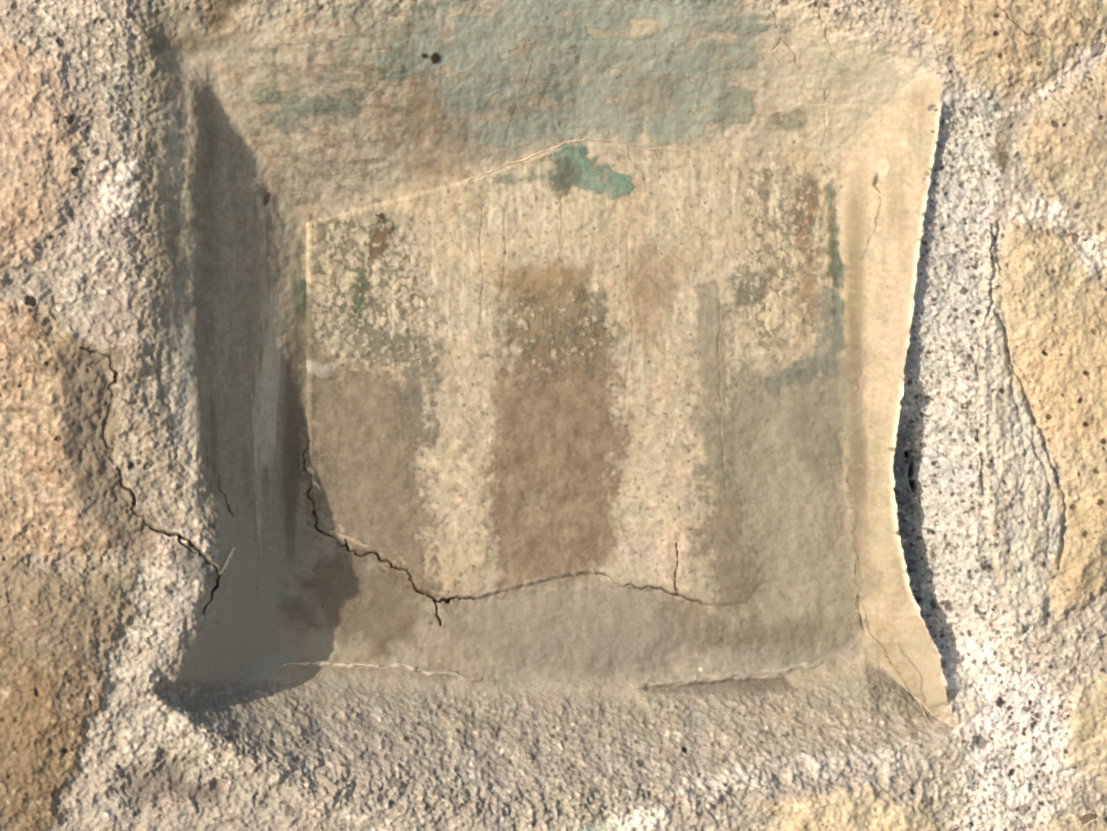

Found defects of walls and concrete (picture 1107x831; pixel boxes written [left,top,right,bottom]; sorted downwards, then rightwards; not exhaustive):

peeling [306,219,440,376]
peeling [729,168,821,341]
crack [85,349,117,412]
damp [252,168,442,598]
damp [483,279,630,599]
crack [110,448,219,596]
crack [346,545,475,625]